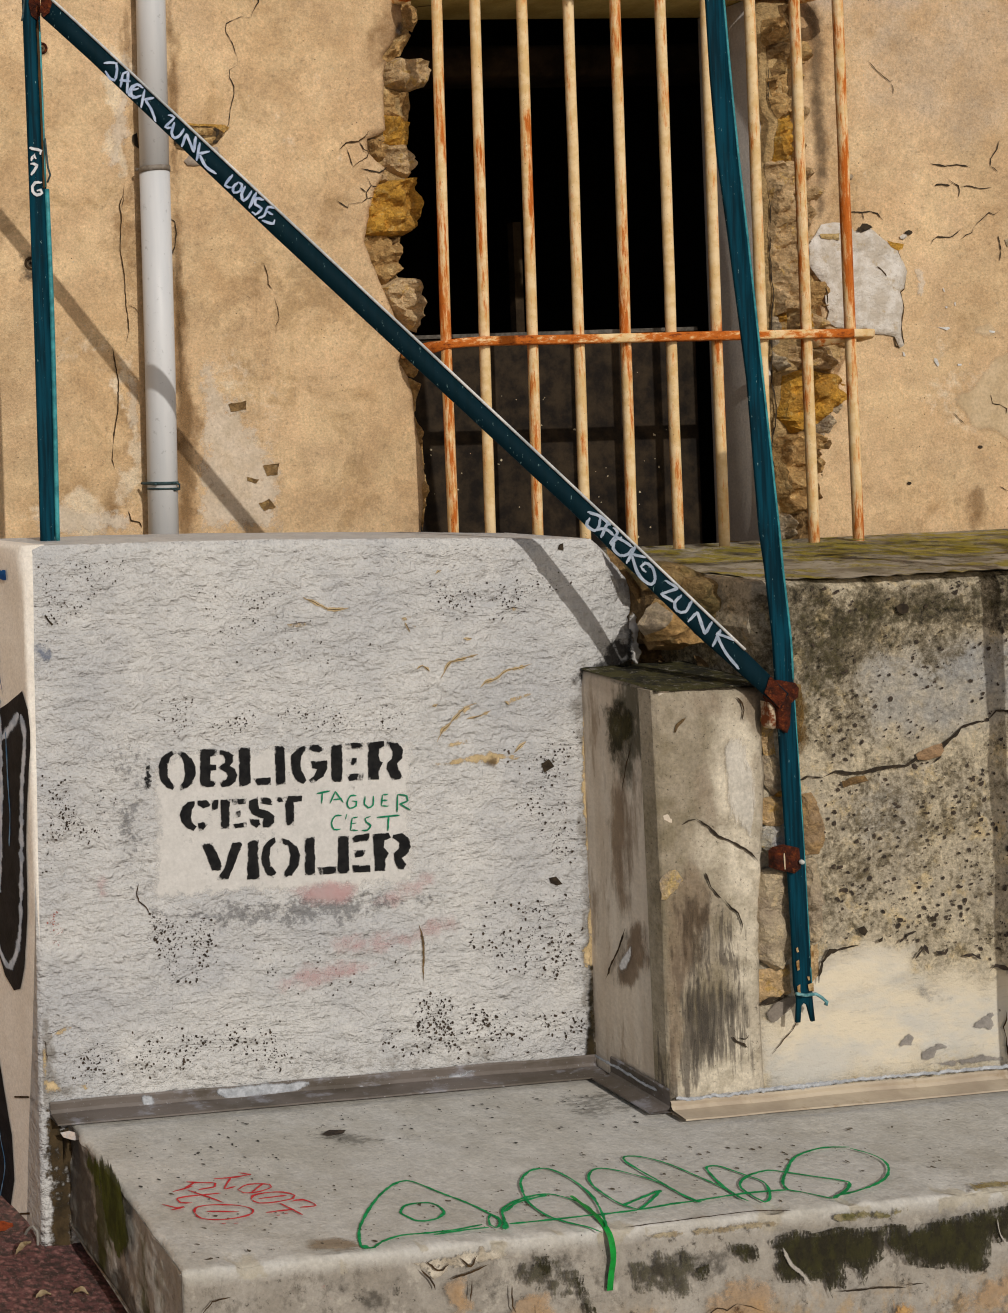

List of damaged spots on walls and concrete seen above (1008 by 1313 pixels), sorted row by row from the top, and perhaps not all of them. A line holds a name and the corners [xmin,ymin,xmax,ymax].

crack [218,0,259,154]
flaking render [364,3,431,337]
crack [930,142,1001,258]
flaking render [761,4,925,540]
flaking render [399,358,429,530]
corrosion [764,677,809,754]
crack [800,709,1008,780]
crack [682,819,756,858]
water stain [688,981,749,1068]